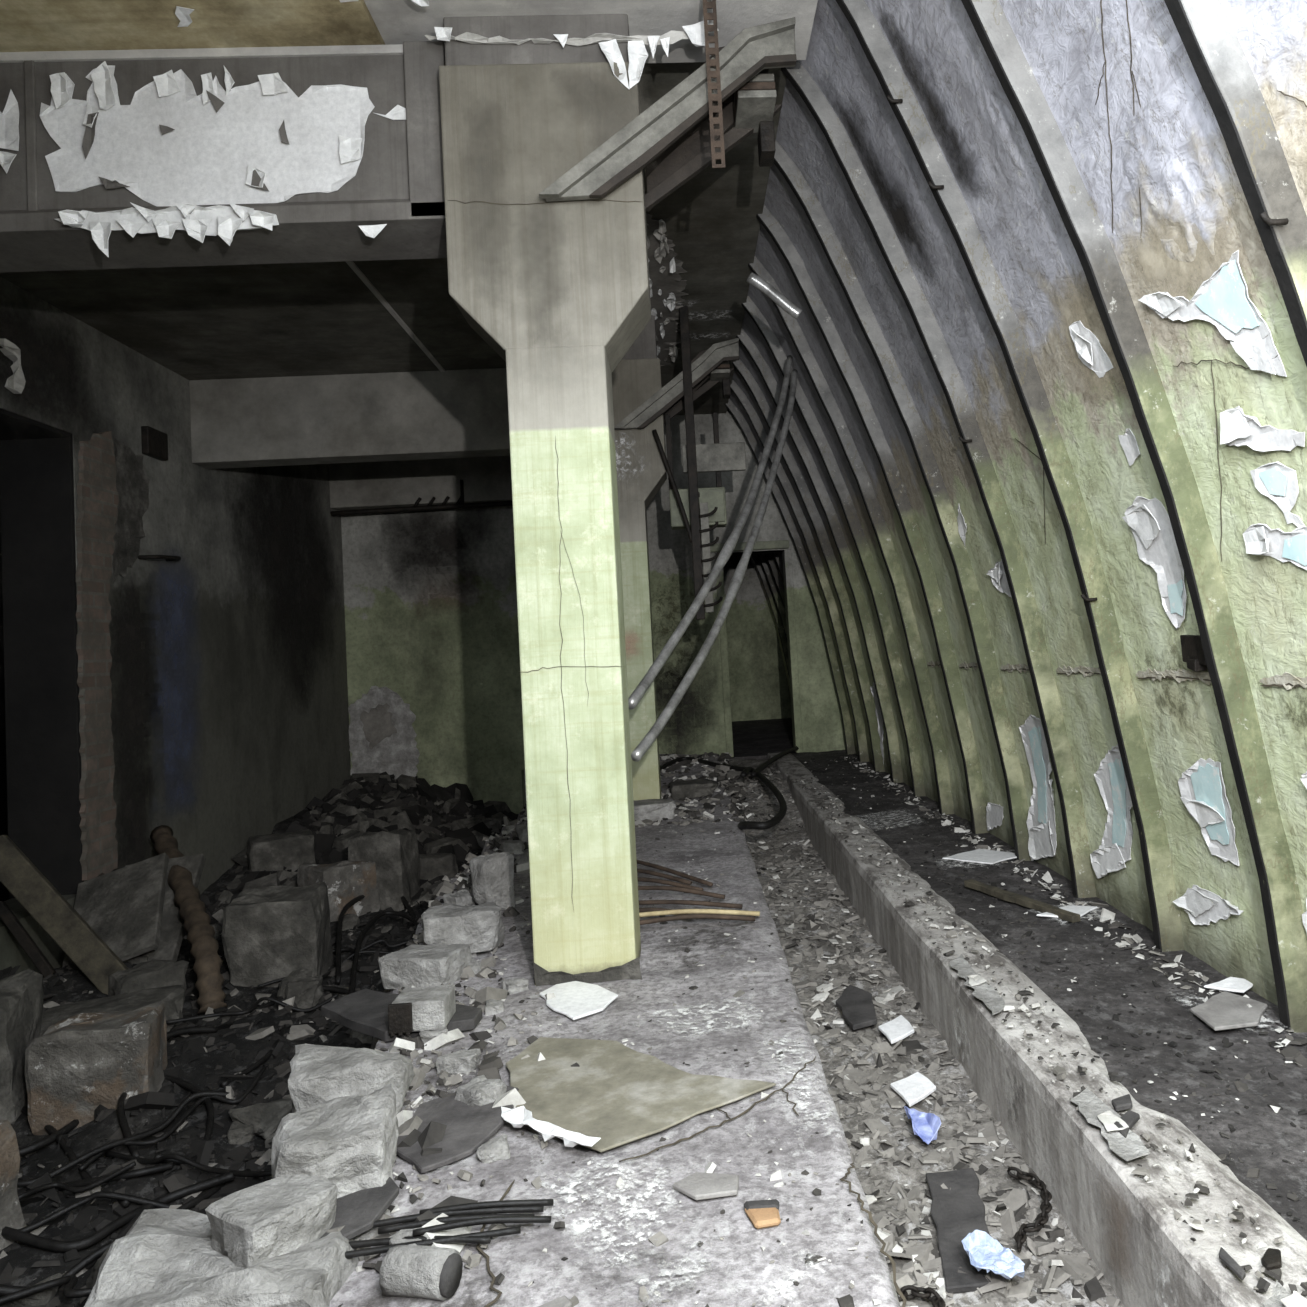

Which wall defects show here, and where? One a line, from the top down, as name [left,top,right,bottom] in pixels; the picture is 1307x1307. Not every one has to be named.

peeling [0,90,19,173]
peeling [40,61,406,258]
peeling [424,20,719,89]
crack [1277,90,1307,107]
peeling [1069,321,1113,378]
peeling [1139,250,1287,377]
peeling [1220,406,1307,570]
peeling [1122,496,1187,628]
peeling [1019,714,1057,861]
peeling [1090,744,1133,878]
peeling [1178,758,1240,866]
peeling [1172,885,1243,925]